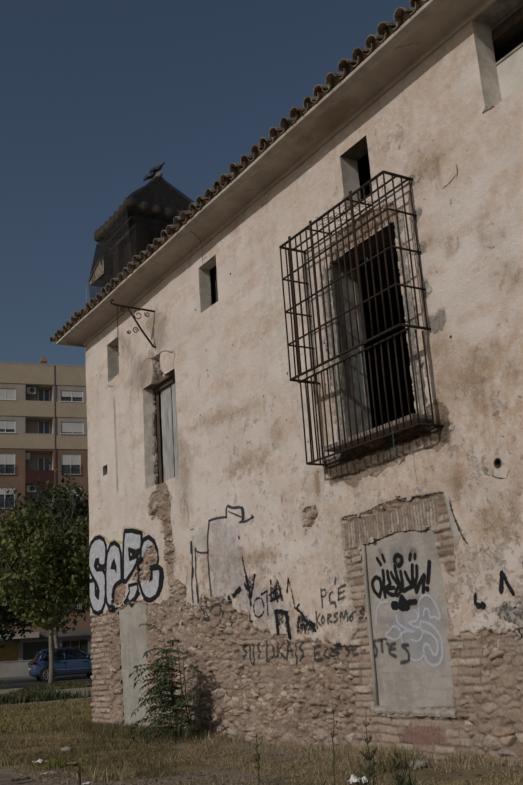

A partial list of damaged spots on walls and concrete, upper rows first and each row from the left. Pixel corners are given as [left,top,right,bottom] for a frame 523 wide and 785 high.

spalling [317,203,455,488]
spalling [90,395,523,766]